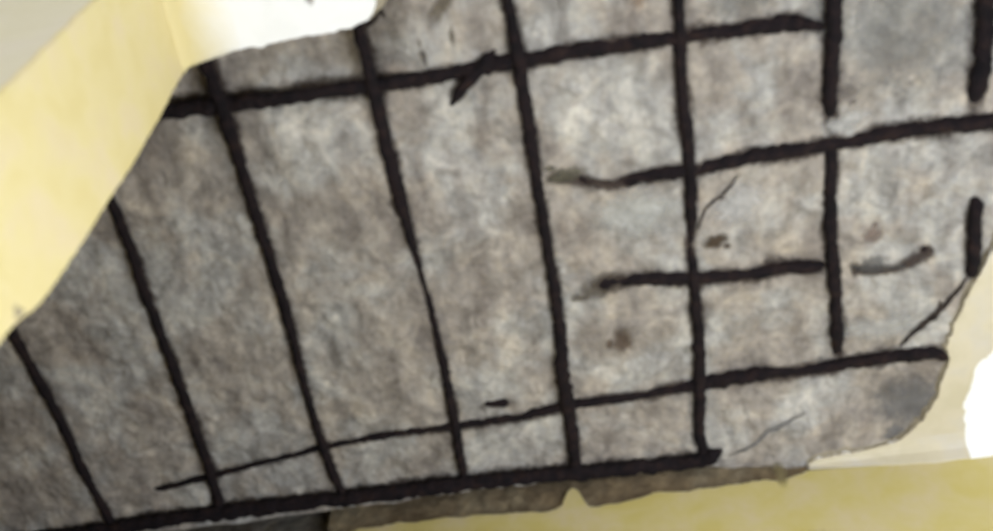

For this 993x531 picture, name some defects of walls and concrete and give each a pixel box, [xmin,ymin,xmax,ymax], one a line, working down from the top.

spalling [0,0,778,531]
crack [729,412,806,456]
spalling [671,0,993,479]